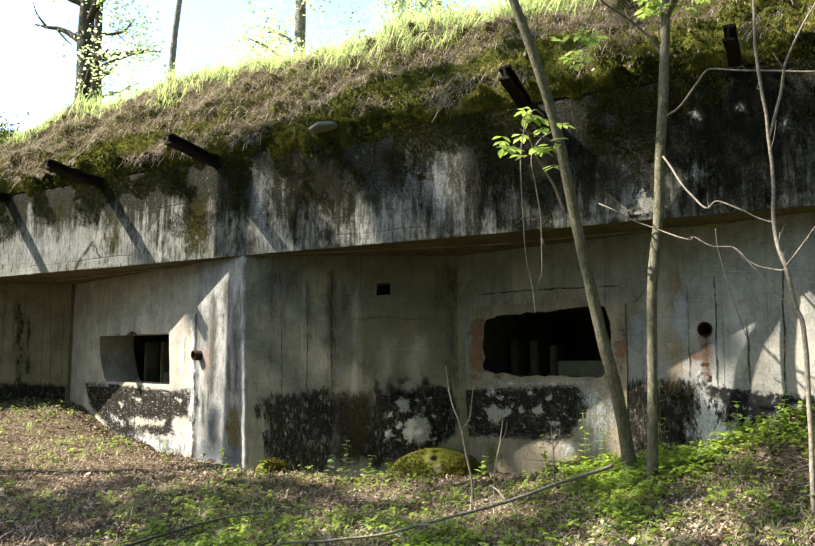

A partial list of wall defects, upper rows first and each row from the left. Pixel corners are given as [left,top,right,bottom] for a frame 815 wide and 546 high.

water stain [273,143,353,246]
water stain [463,148,504,228]
water stain [514,126,565,223]
water stain [562,112,619,198]
water stain [667,61,815,207]
water stain [135,318,213,454]
water stain [208,283,238,393]
crack [480,285,621,302]
water stain [686,375,729,444]
crack [711,280,719,387]
crack [780,264,788,393]